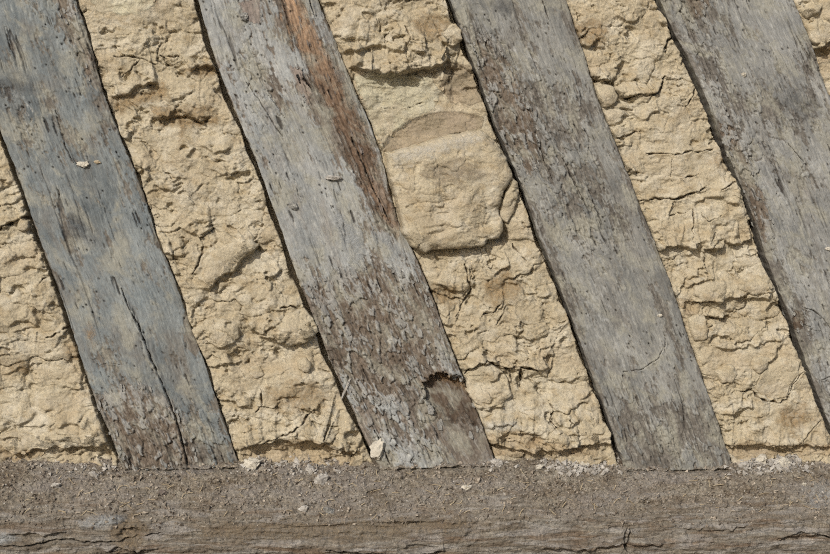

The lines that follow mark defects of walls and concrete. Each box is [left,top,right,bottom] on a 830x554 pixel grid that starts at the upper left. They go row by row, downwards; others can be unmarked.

crack [457,264,471,315]
crack [742,372,803,403]